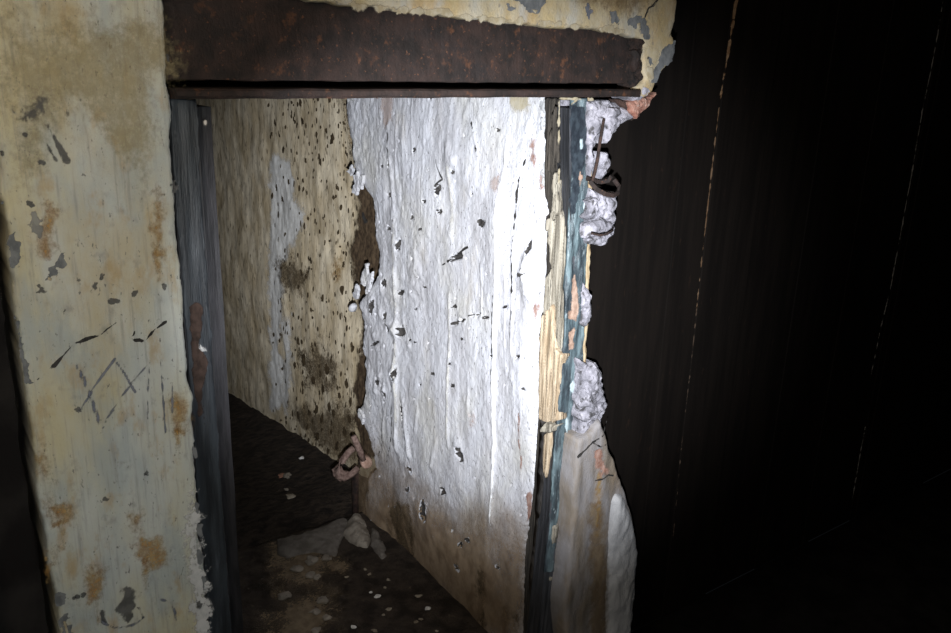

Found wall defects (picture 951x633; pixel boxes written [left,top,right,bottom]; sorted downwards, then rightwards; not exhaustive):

peeling [349,0,650,40]
rust [617,38,649,89]
peeling [346,164,365,195]
peeling [539,97,570,134]
spalling [579,40,676,246]
damp [267,98,360,462]
peeling [348,263,417,343]
damp [359,135,526,633]
spalling [568,275,607,433]